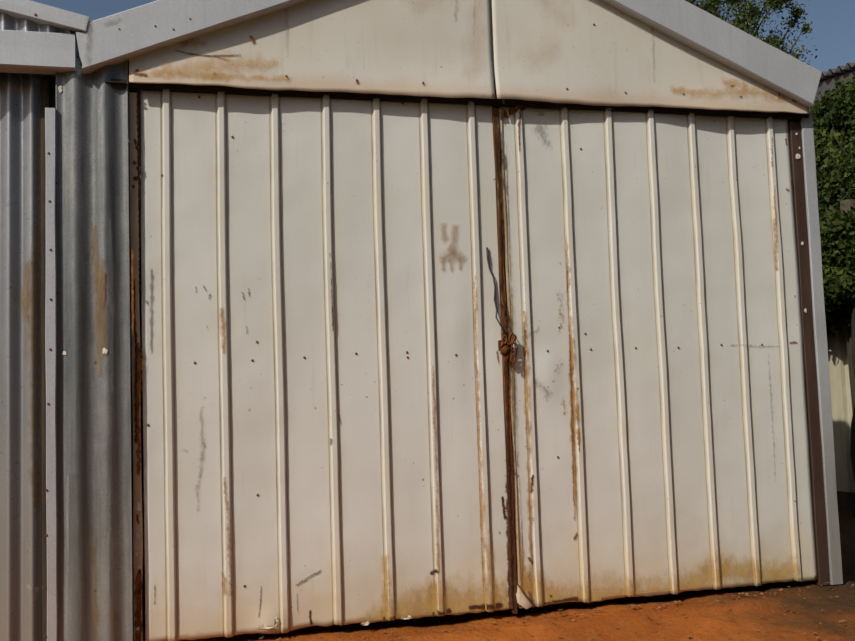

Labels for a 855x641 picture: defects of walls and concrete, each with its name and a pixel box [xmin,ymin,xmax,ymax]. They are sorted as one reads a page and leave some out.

rust [131,88,143,475]
rust [134,569,143,641]
leakage [488,548,497,610]
rust [493,105,525,337]
rust [469,351,578,610]
rust [523,311,531,454]
rust [555,267,580,519]